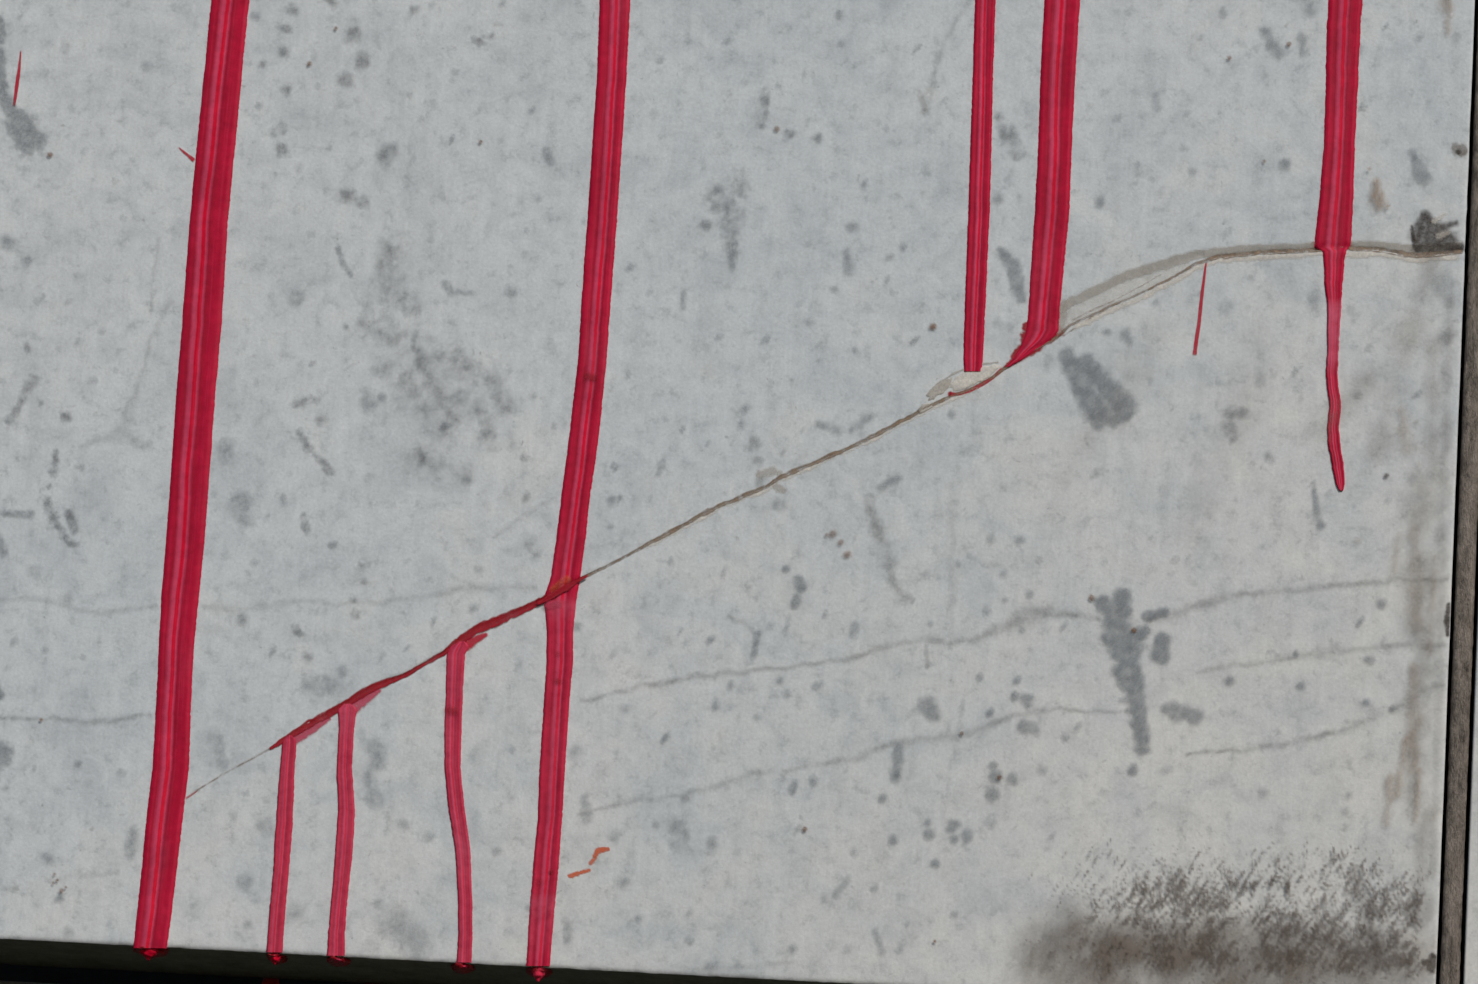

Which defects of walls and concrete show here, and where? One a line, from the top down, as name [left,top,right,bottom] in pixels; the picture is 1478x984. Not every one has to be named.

crack [587,241,1463,576]
mould [1033,842,1423,984]